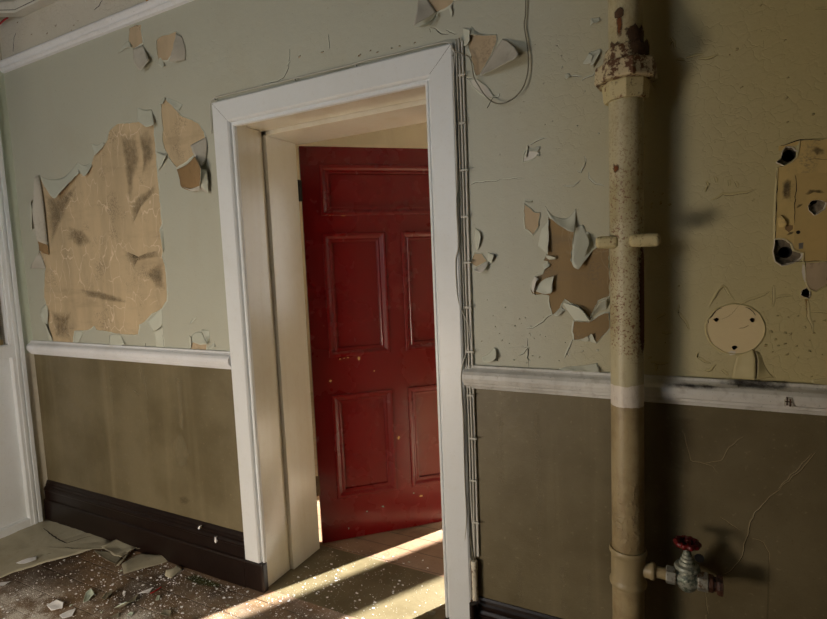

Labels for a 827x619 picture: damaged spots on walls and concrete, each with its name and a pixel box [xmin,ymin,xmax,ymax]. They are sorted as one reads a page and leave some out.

peeling [118,24,186,70]
peeling [413,0,457,28]
peeling [463,26,527,99]
corrosion [610,7,650,55]
spalling [776,146,798,166]
peeling [30,97,209,348]
crack [704,171,797,237]
spalling [808,200,827,216]
peeling [523,199,610,353]
hole [772,238,803,266]